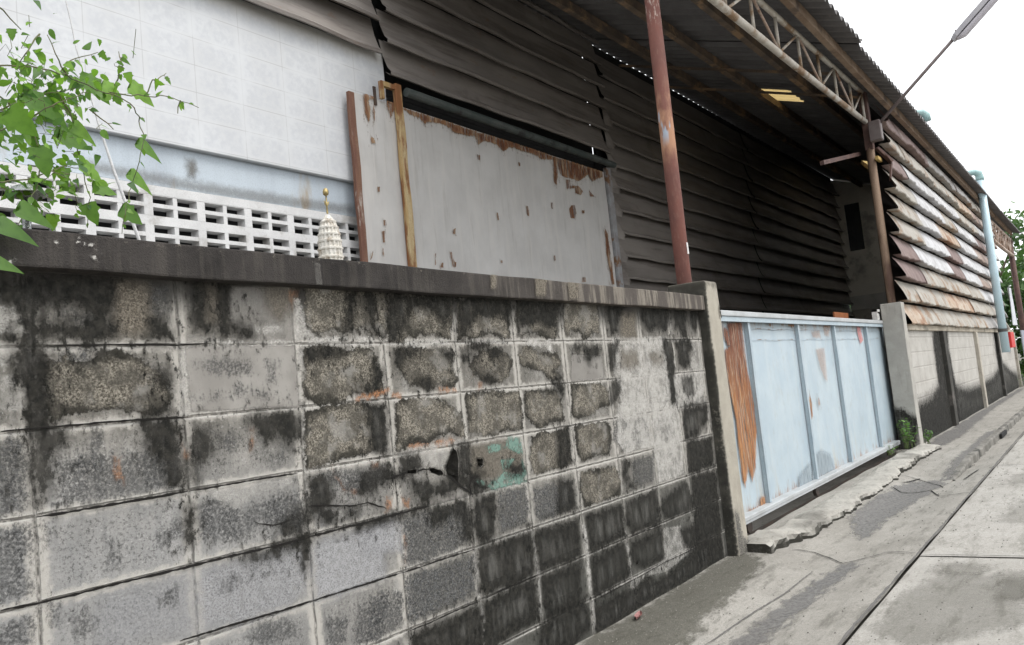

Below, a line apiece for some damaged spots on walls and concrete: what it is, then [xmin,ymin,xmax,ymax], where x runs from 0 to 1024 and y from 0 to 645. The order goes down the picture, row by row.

rust [363,94,603,219]
crack [1,502,430,611]
leakage [0,260,727,645]
crack [388,468,483,494]
peeling [297,288,621,508]
rust [722,322,759,488]
leakage [848,331,1023,539]